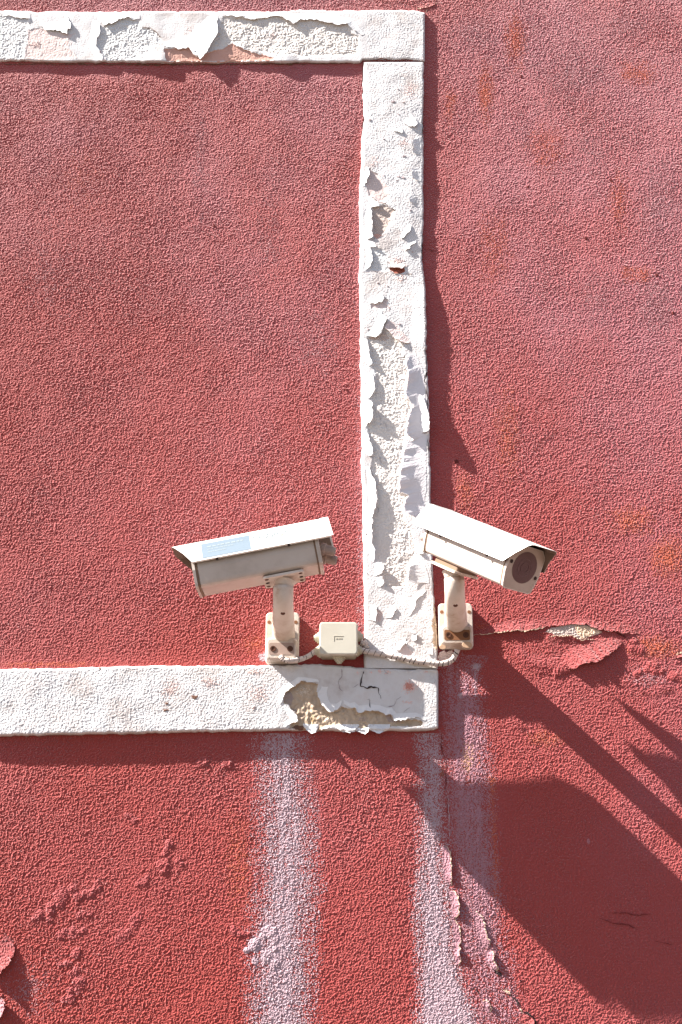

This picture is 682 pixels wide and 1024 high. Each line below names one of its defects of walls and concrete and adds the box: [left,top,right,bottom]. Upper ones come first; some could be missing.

peeling [0,12,77,62]
peeling [88,11,364,64]
peeling [383,88,421,157]
peeling [363,167,453,661]
flaking render [473,618,641,645]
spalling [277,677,427,734]
crack [338,666,409,713]